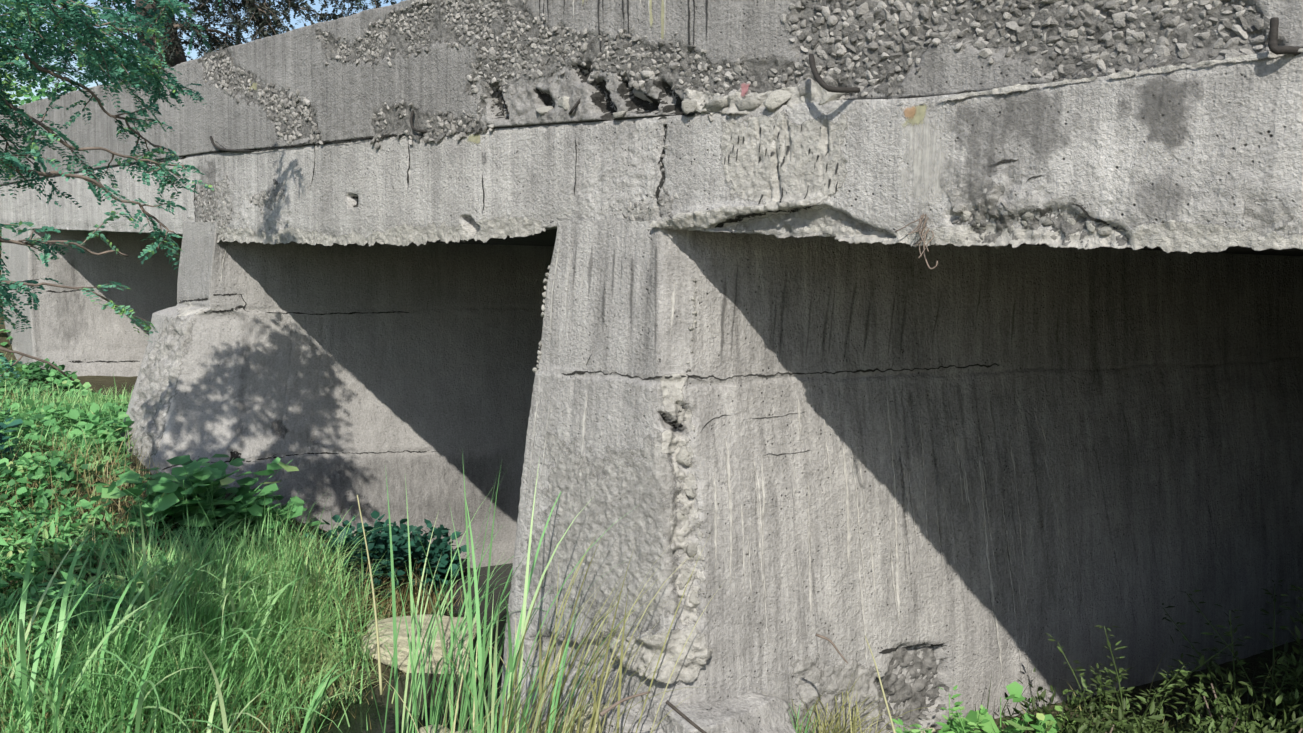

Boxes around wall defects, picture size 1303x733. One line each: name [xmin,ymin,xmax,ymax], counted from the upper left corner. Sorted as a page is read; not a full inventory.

spalling [197,46,324,144]
crack [656,112,702,205]
spalling [315,0,1303,253]
crack [562,354,999,433]
peeling [511,408,713,684]
spalling [791,645,949,732]